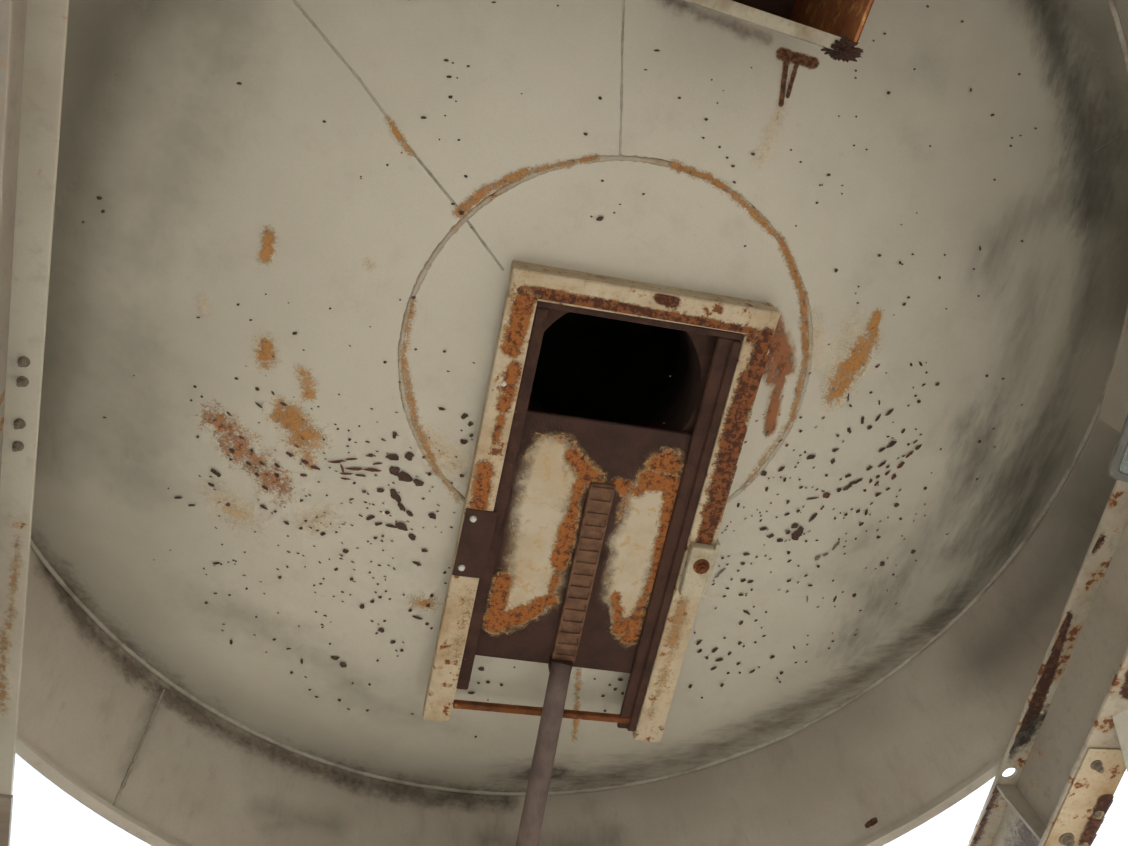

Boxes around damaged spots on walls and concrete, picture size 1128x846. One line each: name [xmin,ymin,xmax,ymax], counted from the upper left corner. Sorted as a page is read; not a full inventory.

corrosion [776,33,863,107]
corrosion [258,227,275,263]
corrosion [254,337,275,370]
corrosion [491,160,811,545]
corrosion [822,309,881,405]
corrosion [202,403,292,506]
corrosion [267,366,327,469]
corrosion [400,300,496,511]
corrosion [1091,532,1106,554]
corrosion [1015,610,1073,744]
corrosion [1119,671,1128,700]